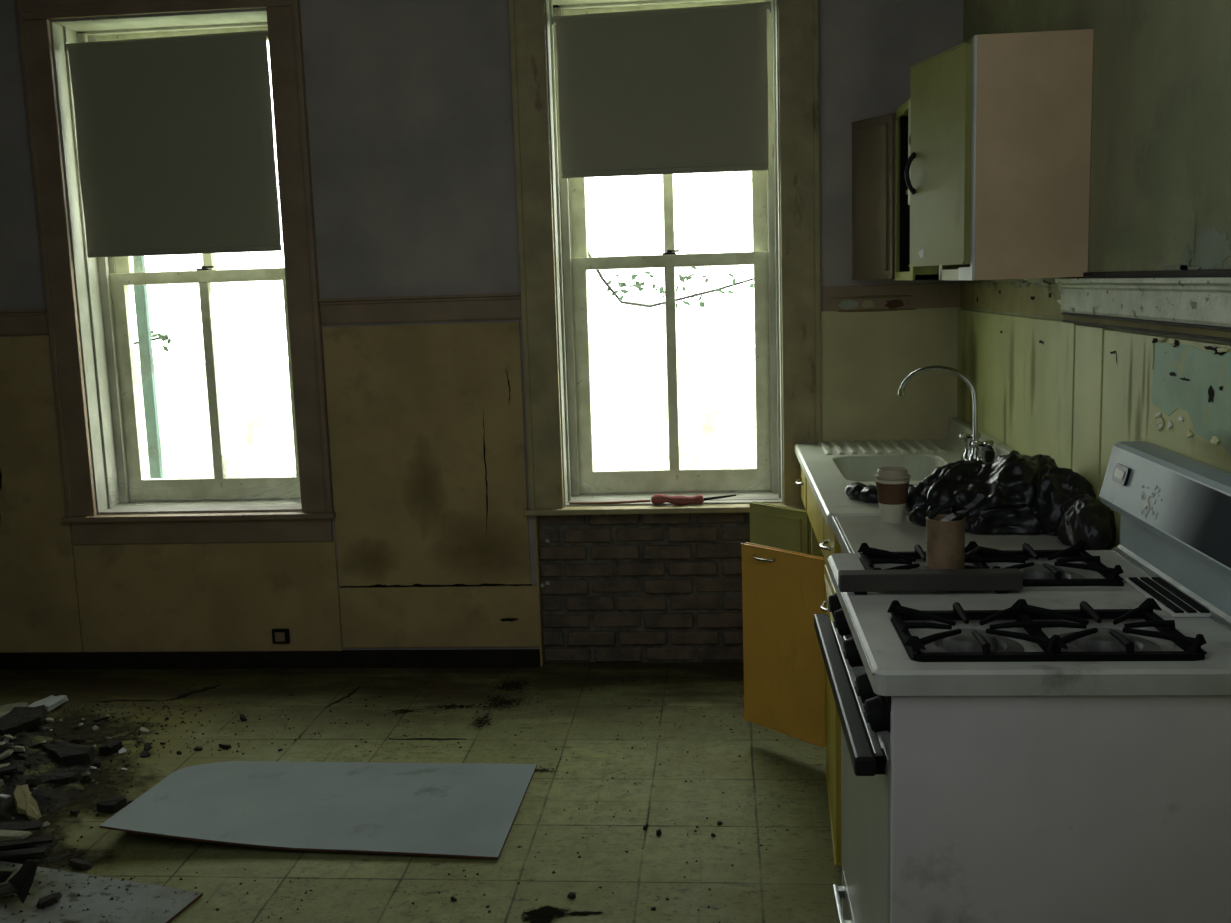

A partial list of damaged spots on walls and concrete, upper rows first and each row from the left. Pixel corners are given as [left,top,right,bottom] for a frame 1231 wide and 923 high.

peeling [1151,337,1231,456]